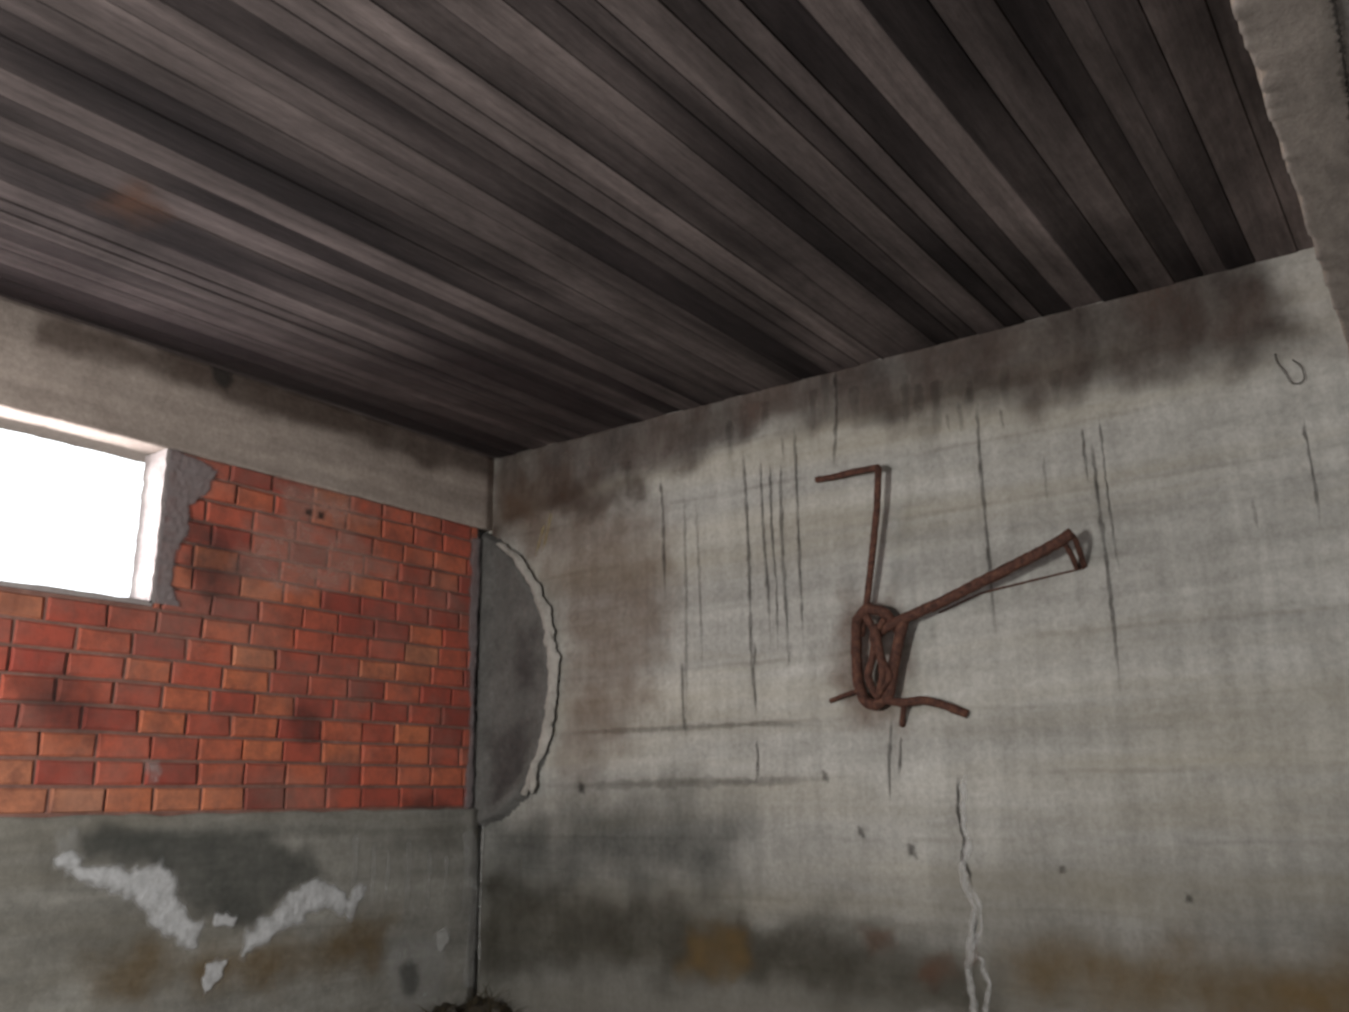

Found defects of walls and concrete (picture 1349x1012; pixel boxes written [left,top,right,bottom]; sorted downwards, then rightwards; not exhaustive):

water stain [492,264,1285,537]
rust [815,464,1087,727]
water stain [92,830,298,919]
water stain [479,875,866,984]
crack [956,784,990,1012]